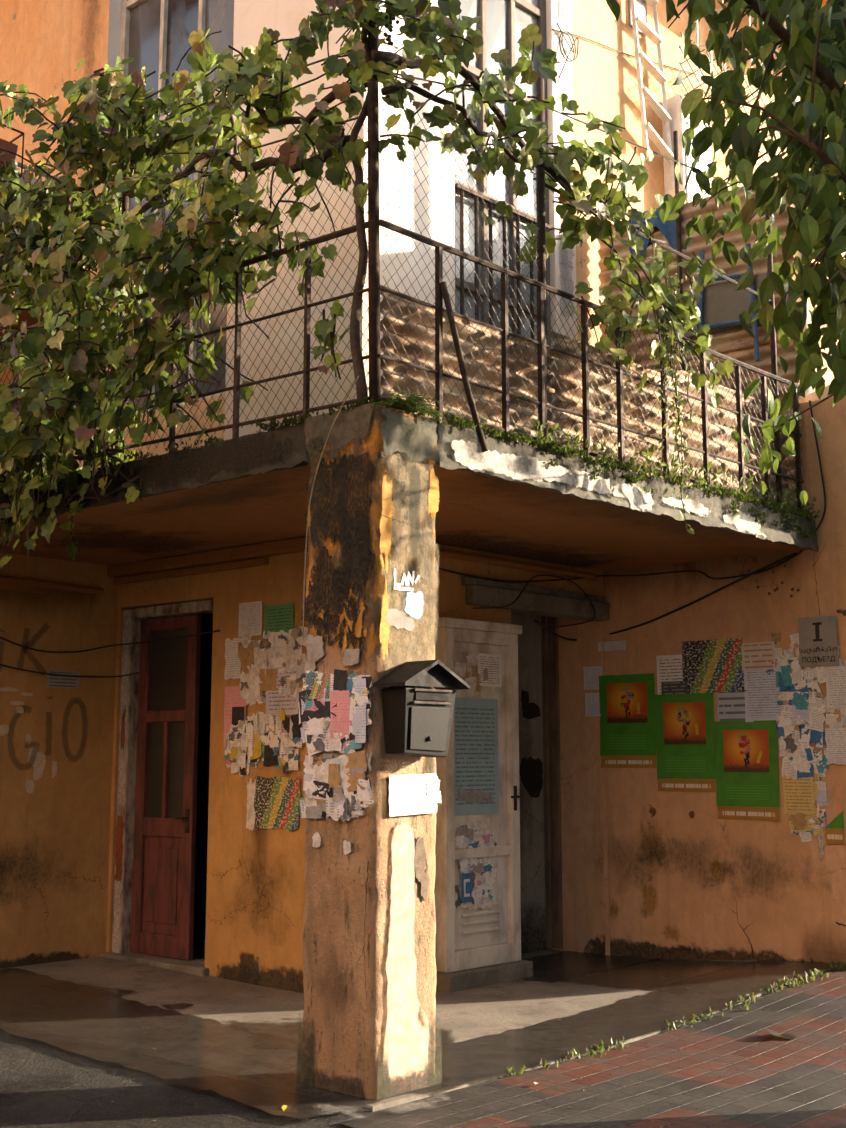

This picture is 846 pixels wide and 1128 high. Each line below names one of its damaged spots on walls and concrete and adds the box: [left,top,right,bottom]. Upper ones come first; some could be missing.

peeling [224,403,767,821]
water stain [0,909,841,1119]
crack [728,899,754,957]